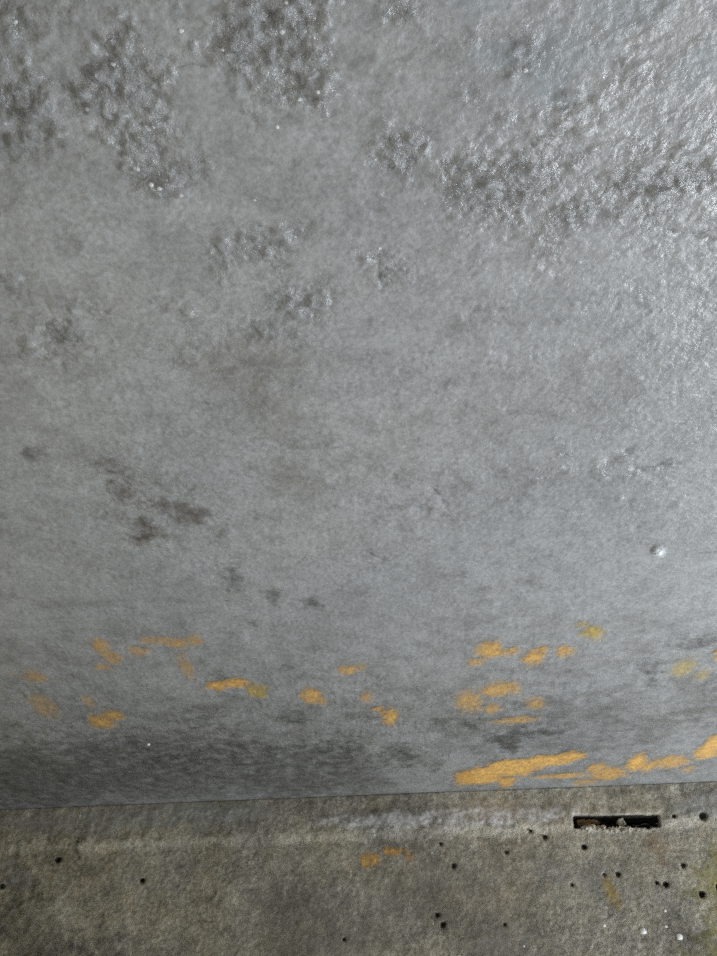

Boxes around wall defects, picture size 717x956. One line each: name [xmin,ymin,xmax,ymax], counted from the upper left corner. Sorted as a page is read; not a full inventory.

corrosion [473,644,515,663]
corrosion [210,679,262,695]
corrosion [457,736,717,787]